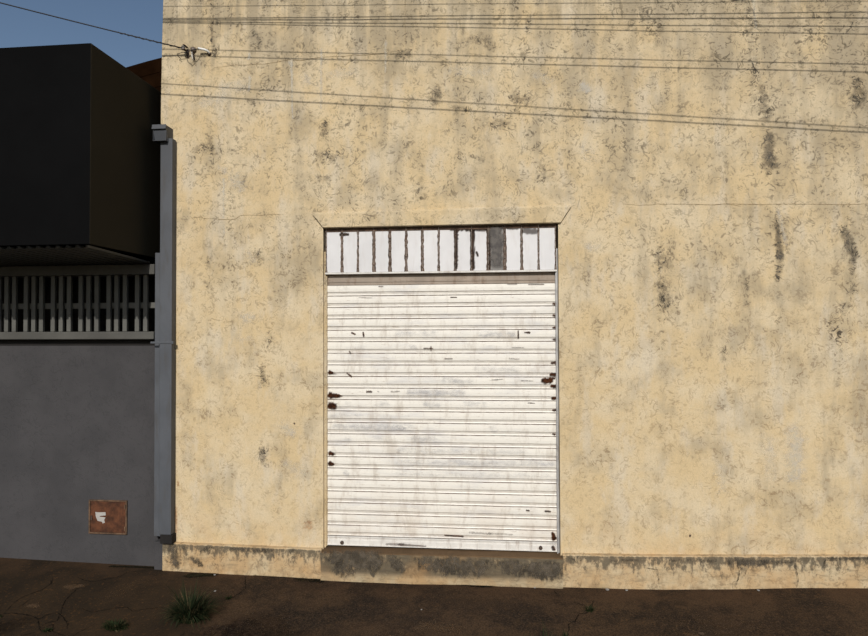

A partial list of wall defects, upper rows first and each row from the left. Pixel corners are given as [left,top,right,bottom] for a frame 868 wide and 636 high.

leakage [762,131,775,174]
leakage [775,223,783,280]
corrosion [541,361,556,411]
corrosion [327,392,342,410]
leakage [320,550,406,577]
leakage [418,556,487,577]
leakage [499,561,562,580]
leakage [728,558,793,566]